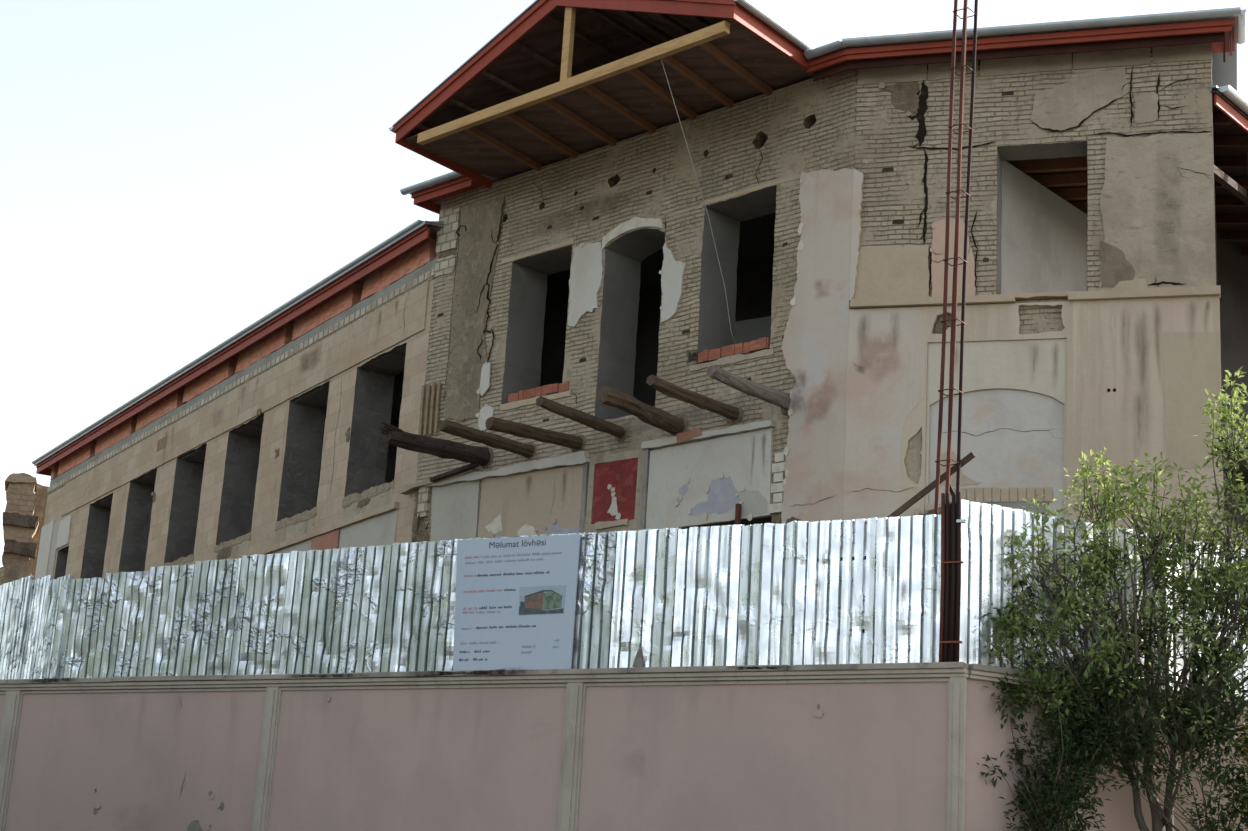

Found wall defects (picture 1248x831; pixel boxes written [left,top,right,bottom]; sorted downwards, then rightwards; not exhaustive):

crack [1032,67,1212,139]
crack [908,81,994,296]
peeling [782,213,805,251]
crack [444,203,504,396]
spalling [932,313,951,334]
spalling [904,428,926,484]
peeling [673,472,802,524]
peeling [485,514,502,538]
peeling [517,518,579,536]